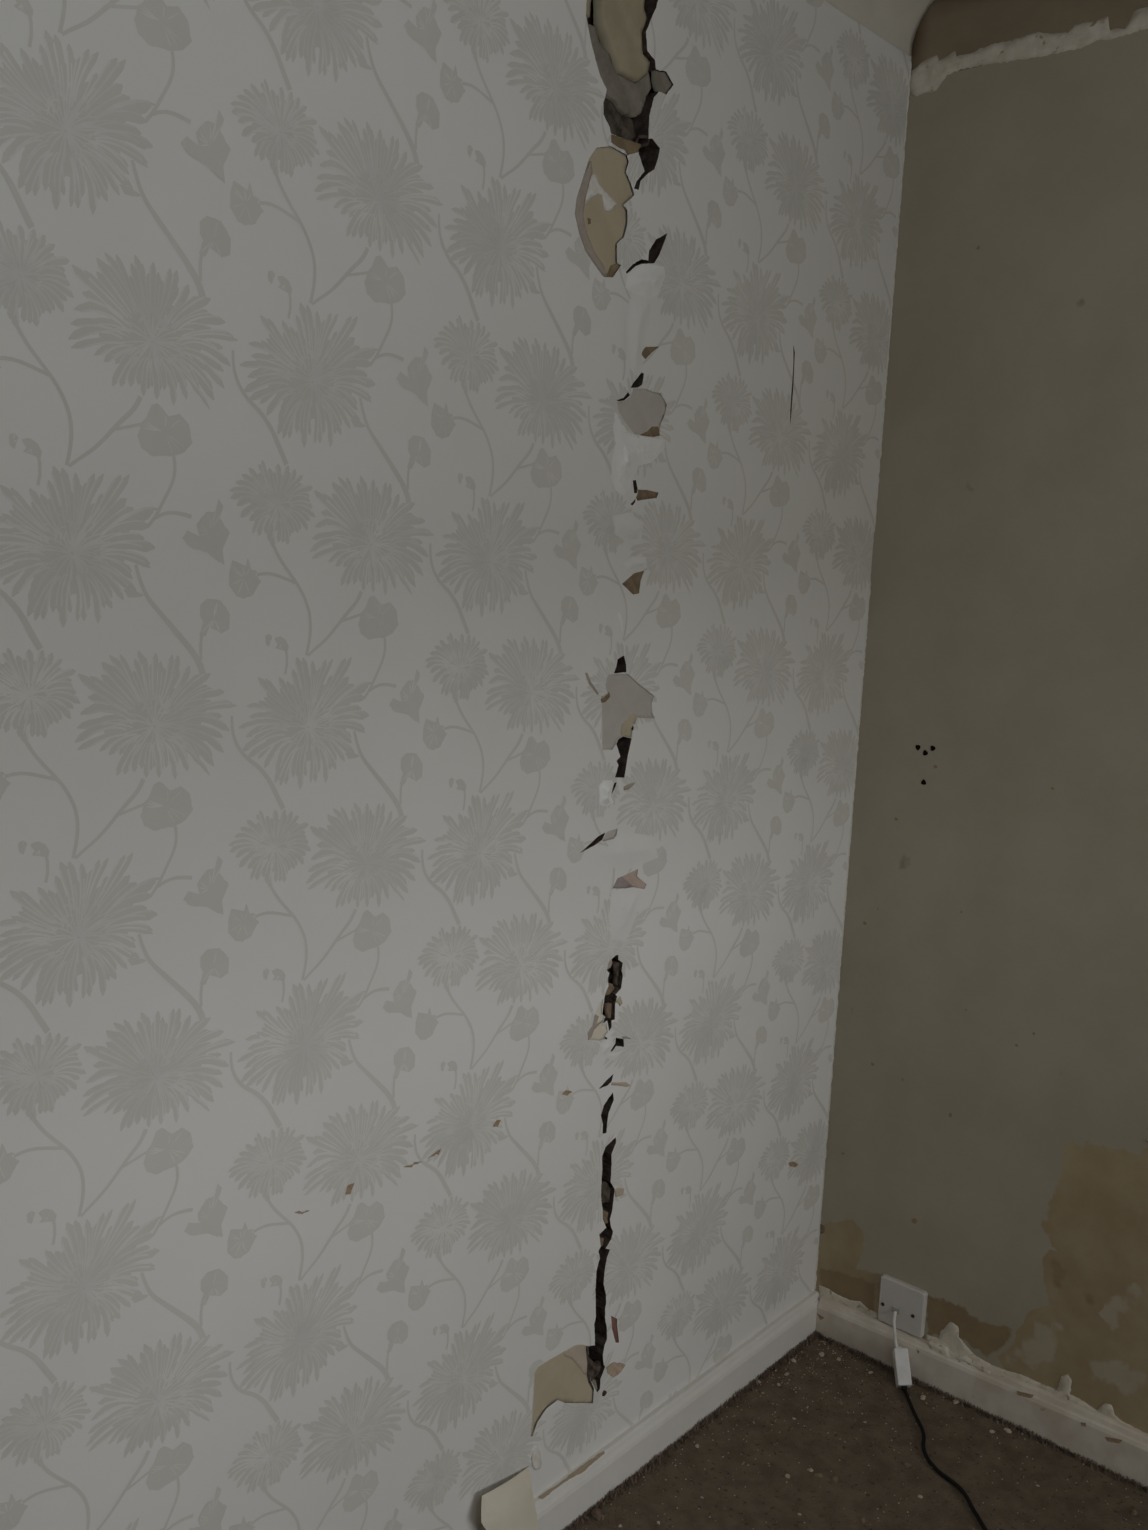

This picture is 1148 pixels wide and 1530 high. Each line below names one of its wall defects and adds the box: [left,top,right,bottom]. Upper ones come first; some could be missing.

spalling [586,0,674,155]
crack [619,135,660,191]
peeling [585,174,617,211]
crack [614,234,667,275]
crack [617,373,644,401]
crack [630,480,638,505]
crack [614,656,626,673]
crack [612,726,634,793]
crack [582,833,605,852]
crack [586,955,624,1392]